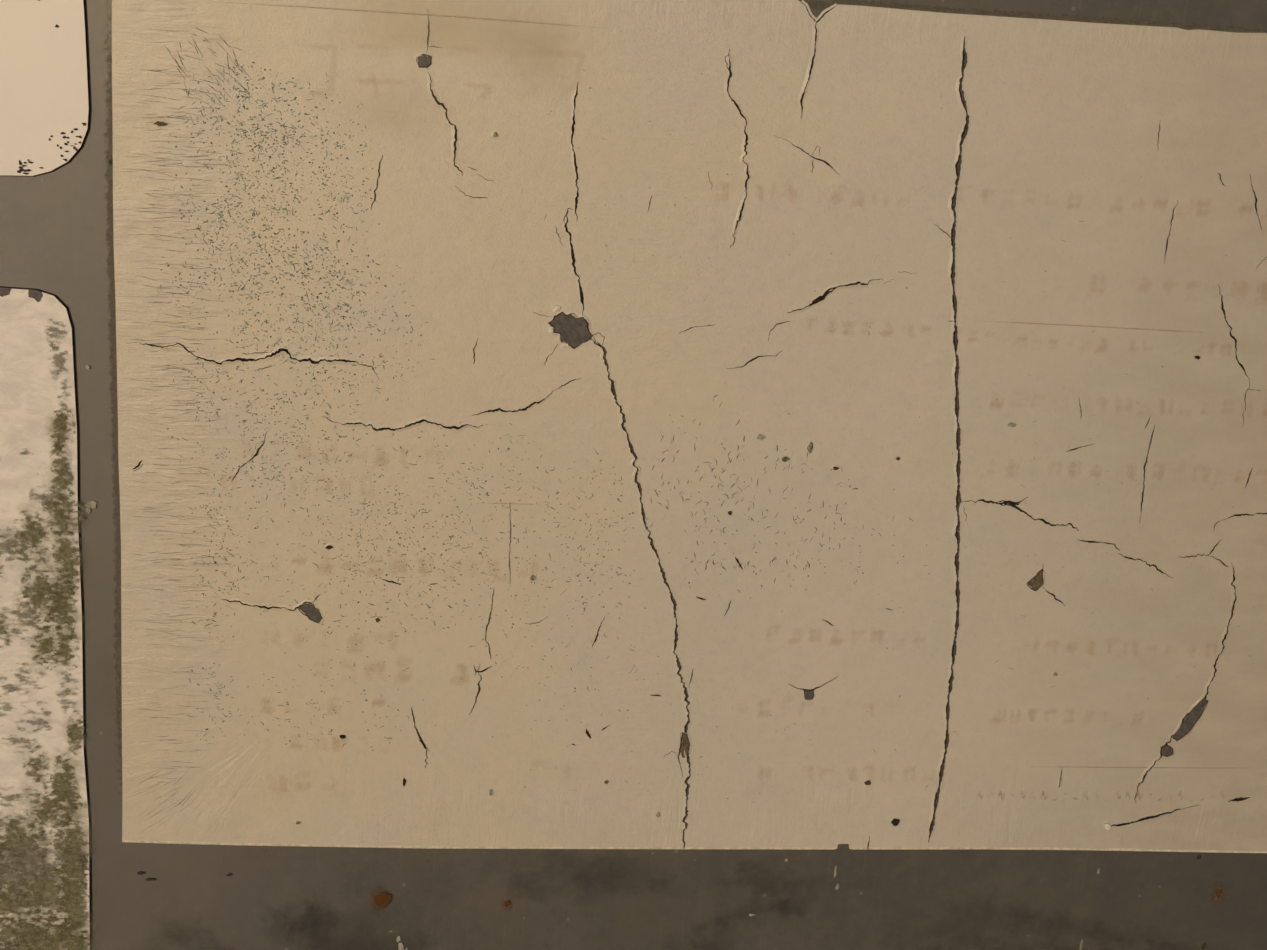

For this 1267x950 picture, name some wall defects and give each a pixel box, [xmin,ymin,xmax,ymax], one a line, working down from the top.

crack [123,17,1267,848]